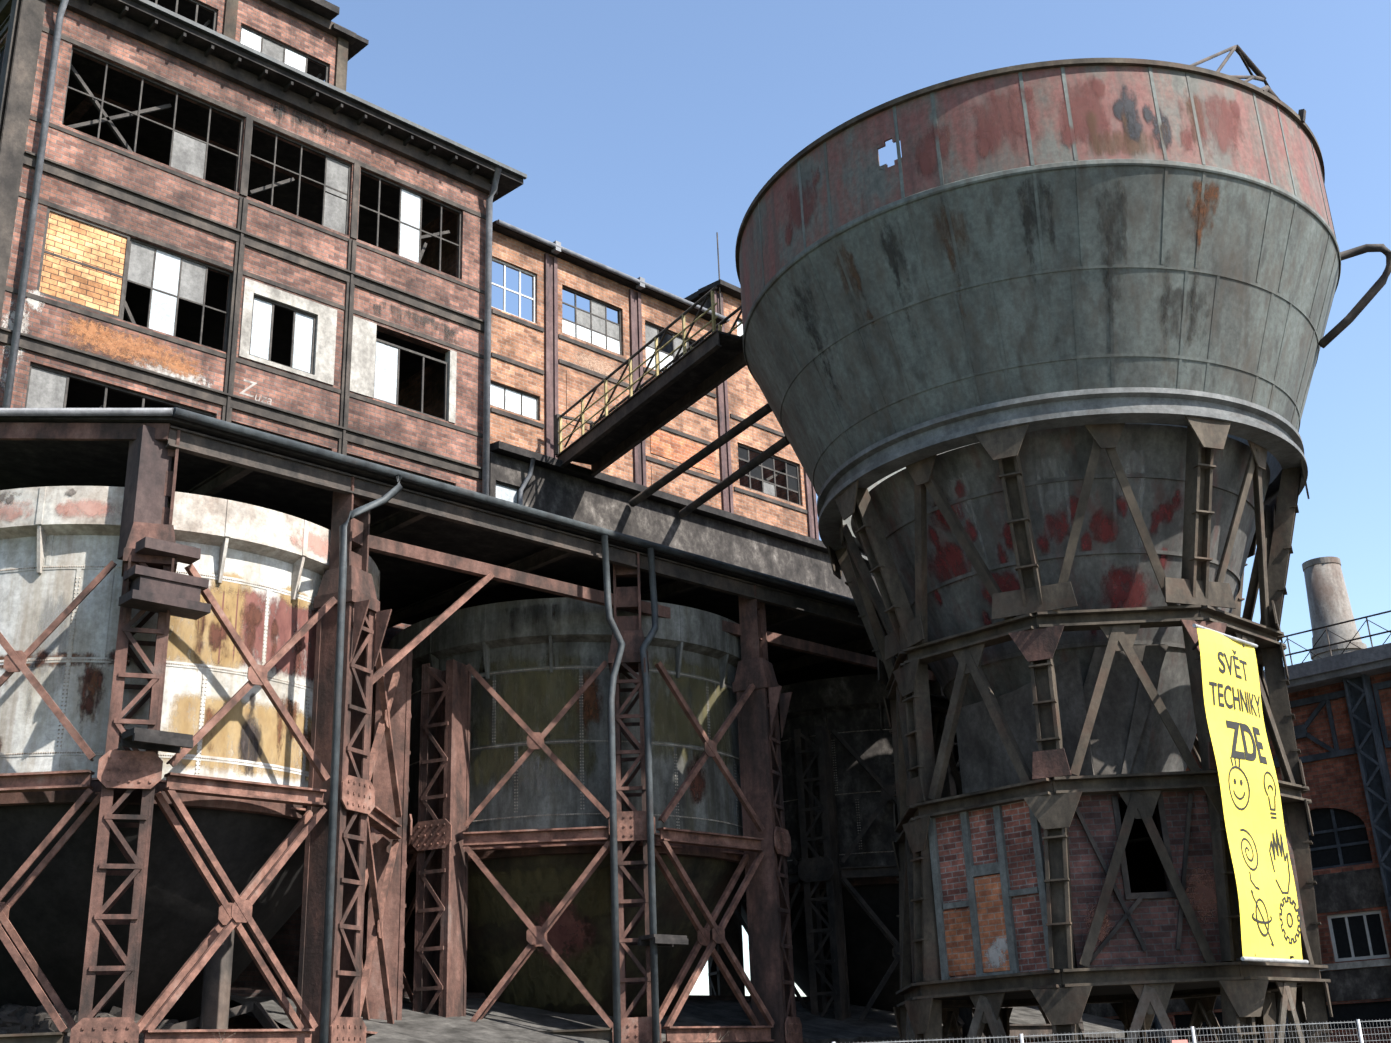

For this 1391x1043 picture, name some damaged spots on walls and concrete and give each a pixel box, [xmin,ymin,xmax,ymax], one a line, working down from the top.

rust [1188,181,1219,246]
peeling [0,491,29,520]
peeling [56,488,110,516]
peeling [291,532,330,557]
rust [167,573,250,669]
rust [26,650,131,720]
rust [165,695,312,781]